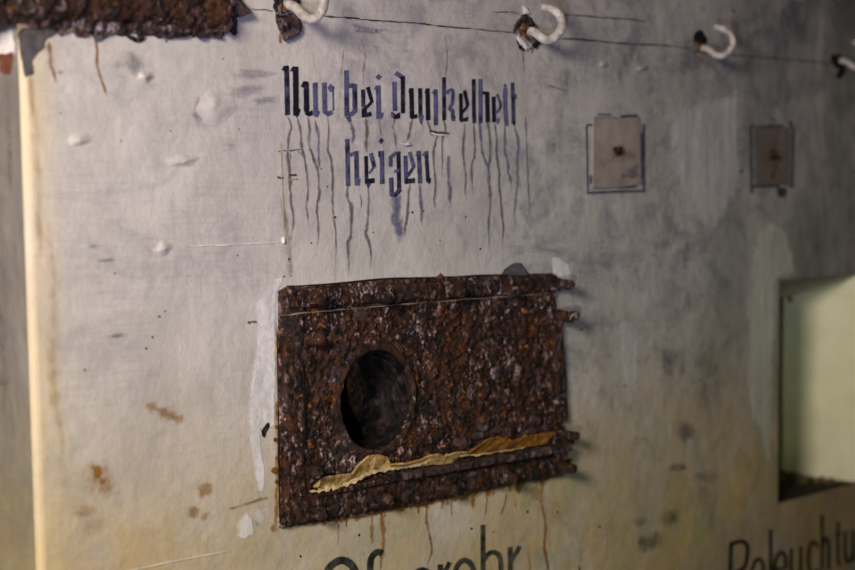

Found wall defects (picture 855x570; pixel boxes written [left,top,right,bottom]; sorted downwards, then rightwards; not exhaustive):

peeling [0,24,57,77]
corrosion [7,0,252,92]
corrosion [490,364,503,379]
corrosion [271,402,285,531]
corrosion [312,479,549,570]